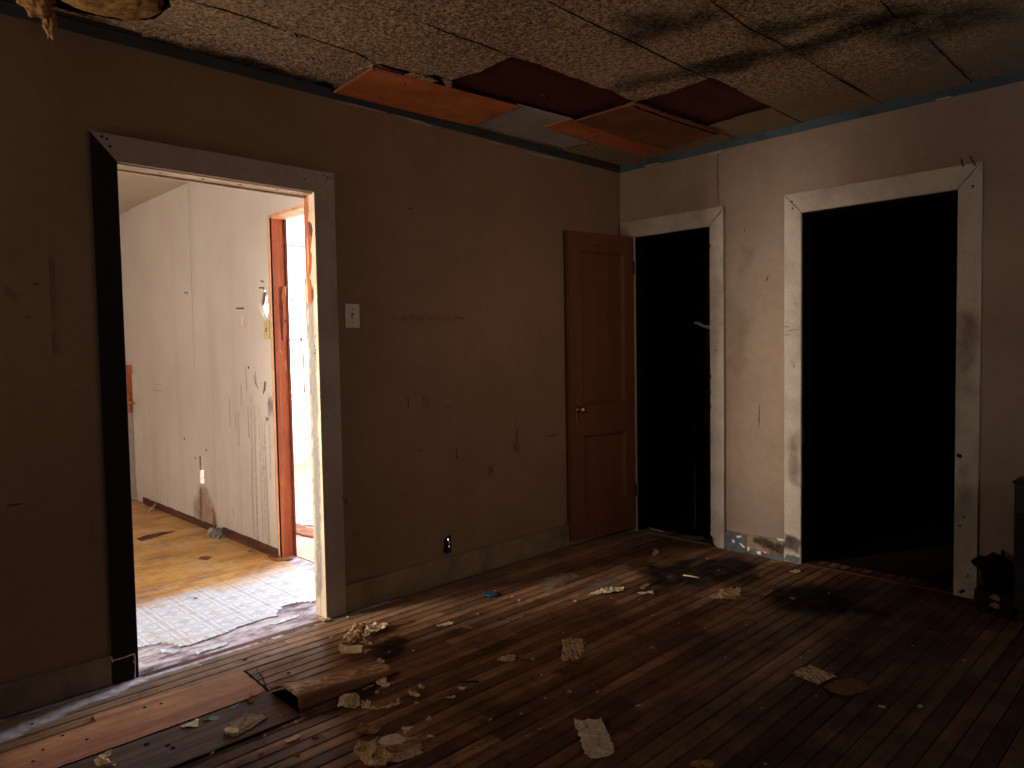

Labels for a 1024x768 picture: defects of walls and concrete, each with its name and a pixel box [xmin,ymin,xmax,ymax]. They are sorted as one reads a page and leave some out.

peeling [724,531,800,563]